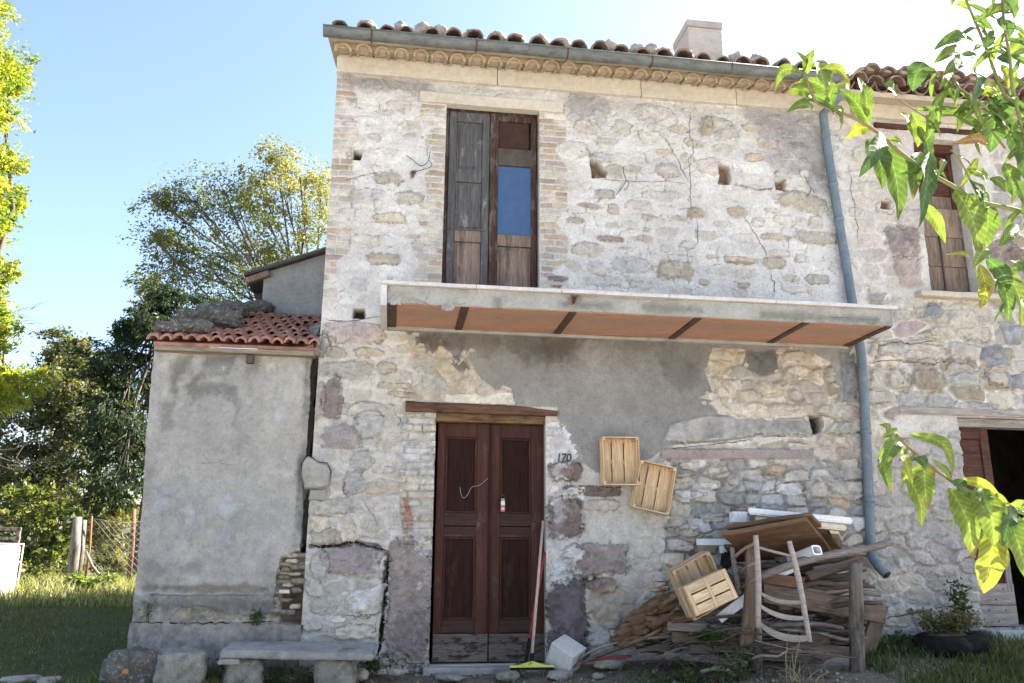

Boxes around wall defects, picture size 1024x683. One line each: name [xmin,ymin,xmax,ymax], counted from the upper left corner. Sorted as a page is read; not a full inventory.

crack [563,114,698,302]
peeling [401,332,515,405]
peeling [666,347,839,445]
peeling [392,441,434,491]
peeling [308,489,355,542]
peeling [414,532,432,556]
peeling [350,583,388,617]